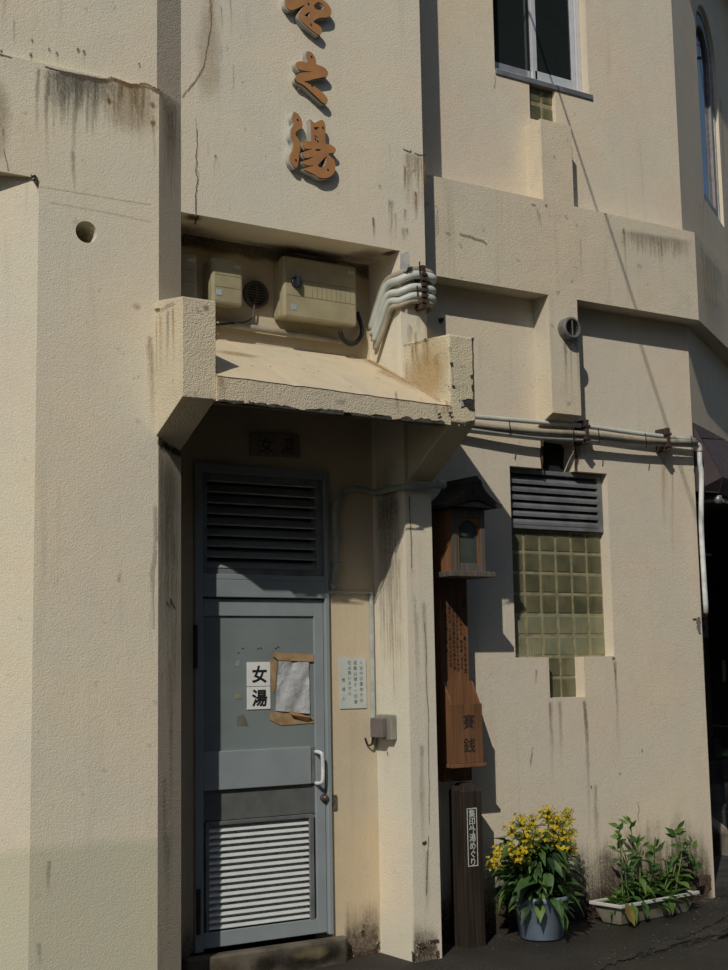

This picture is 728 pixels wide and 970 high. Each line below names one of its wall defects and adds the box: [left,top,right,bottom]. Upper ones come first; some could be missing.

crack [44,0,212,97]
crack [193,121,201,214]
peeling [218,399,445,424]
spalling [448,385,475,426]
leakage [562,852,710,922]
leakage [441,899,452,943]
leakage [484,894,519,936]